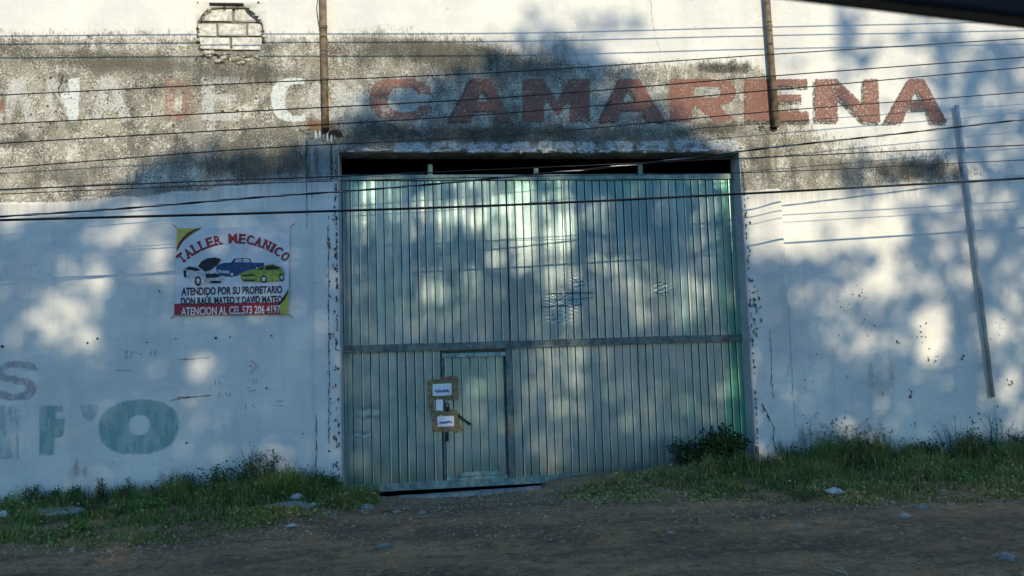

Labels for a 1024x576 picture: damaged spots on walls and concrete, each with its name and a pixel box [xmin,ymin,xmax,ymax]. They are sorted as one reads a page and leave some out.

spalling [195,1,265,65]
mould [699,61,749,73]
mould [677,123,742,136]